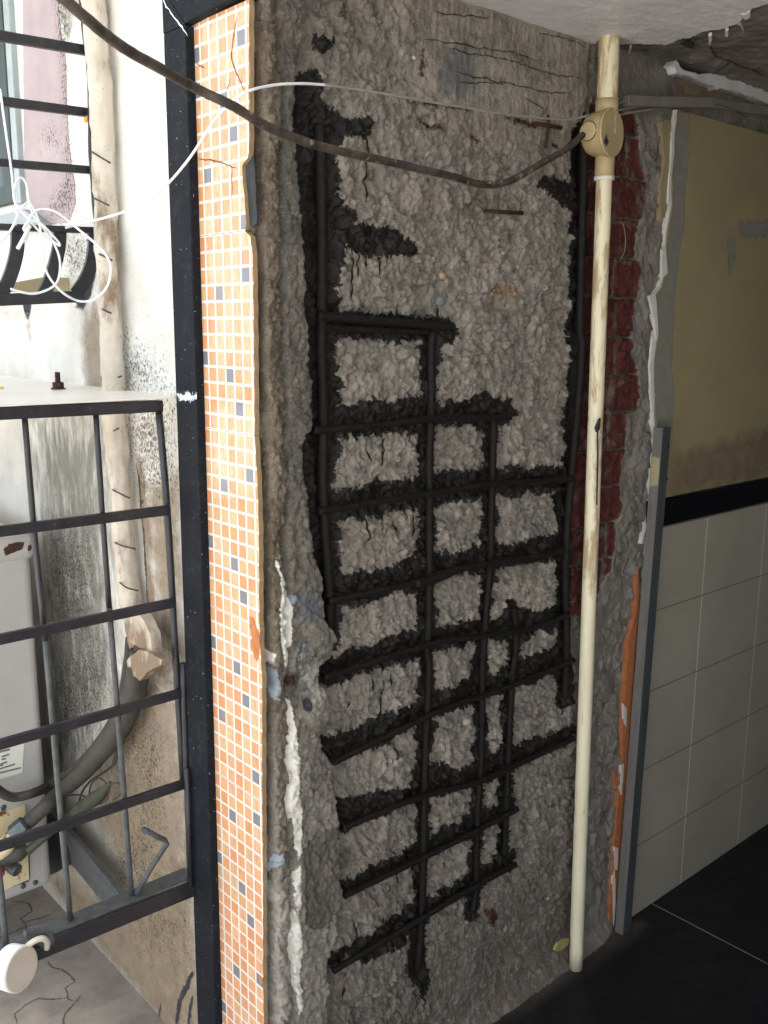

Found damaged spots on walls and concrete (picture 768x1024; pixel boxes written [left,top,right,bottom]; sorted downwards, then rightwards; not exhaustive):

crack [435,11,489,19]
crack [226,22,244,91]
crack [422,39,580,109]
spalling [247,0,768,1024]